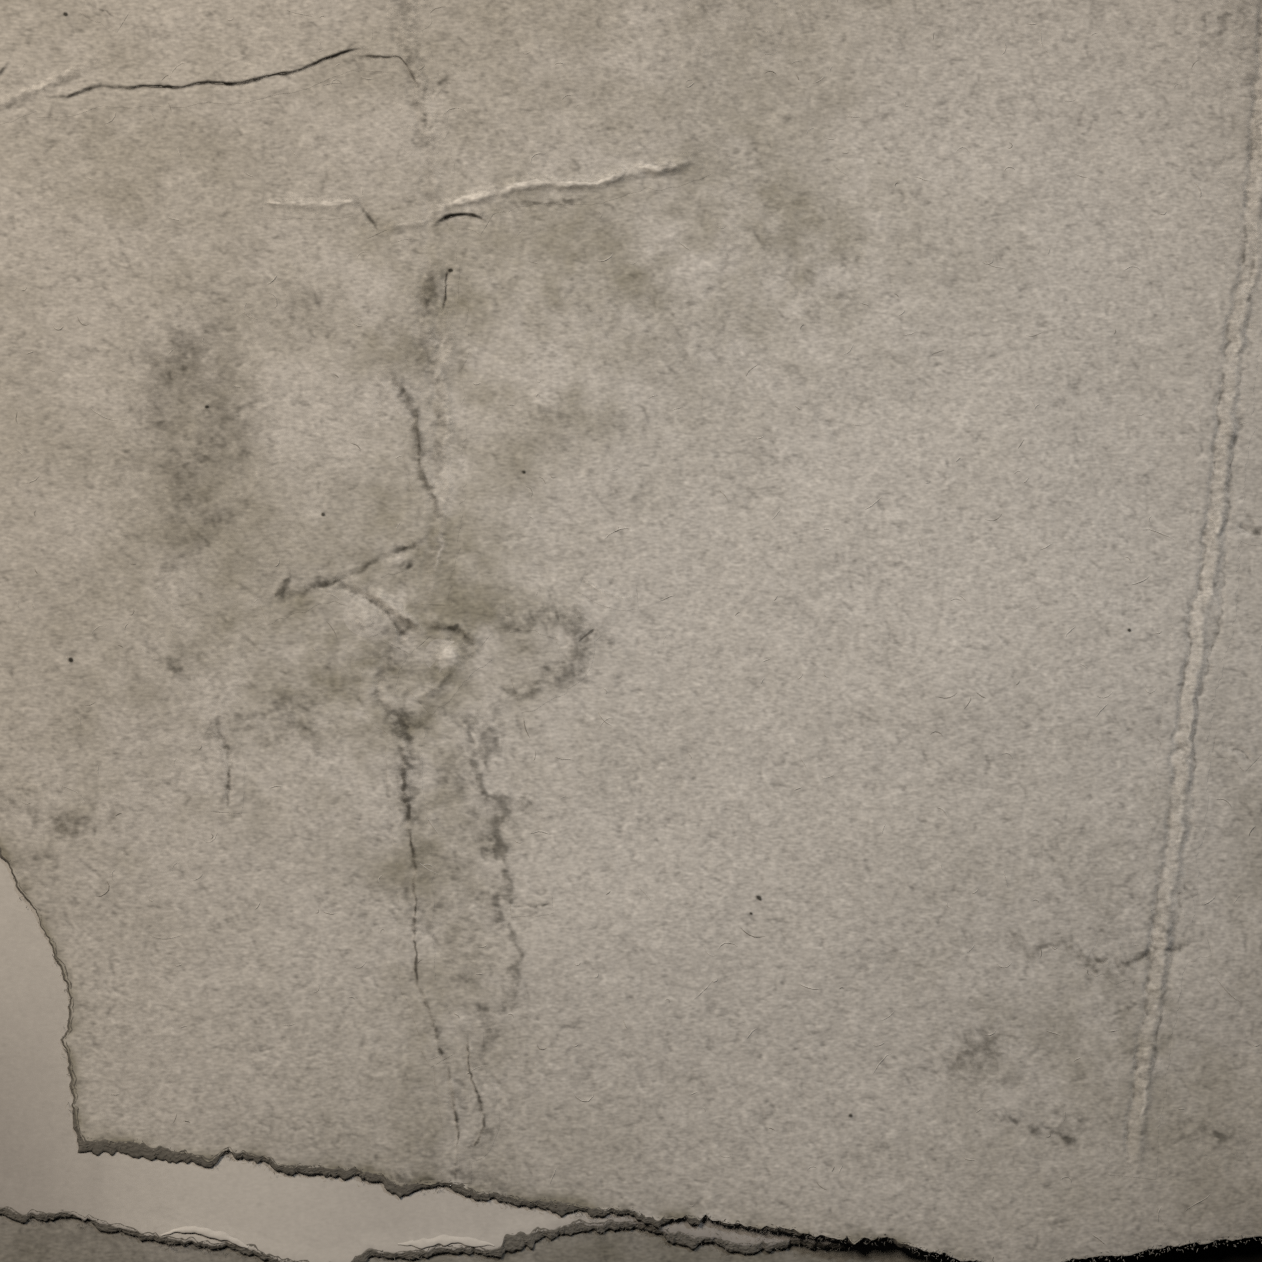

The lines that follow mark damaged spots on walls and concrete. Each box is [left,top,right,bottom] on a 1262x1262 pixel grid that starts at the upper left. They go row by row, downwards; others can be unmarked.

crack [36,28,435,117]
peeling [161,1226,248,1248]
peeling [398,1235,495,1249]